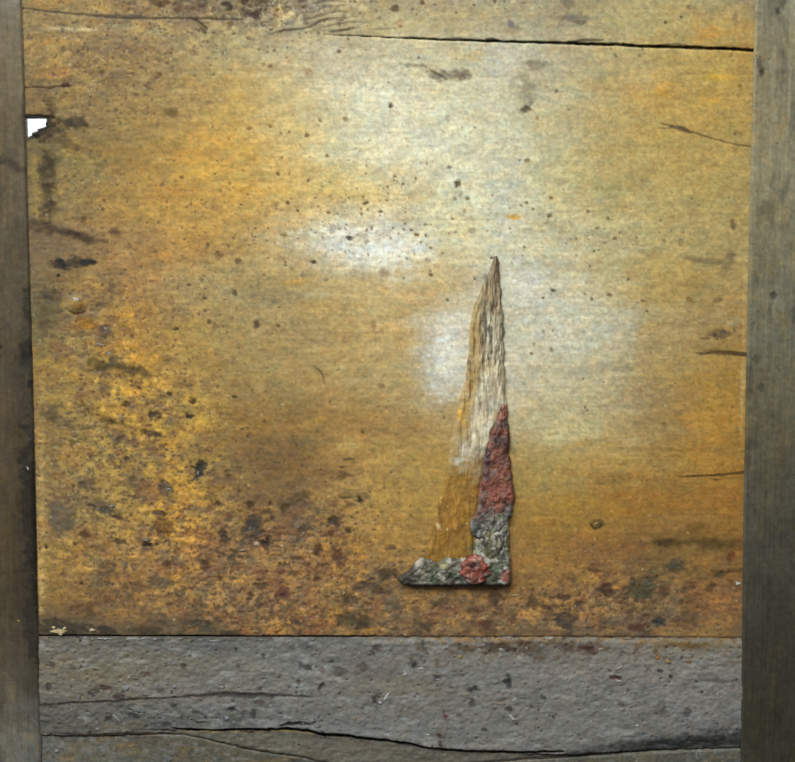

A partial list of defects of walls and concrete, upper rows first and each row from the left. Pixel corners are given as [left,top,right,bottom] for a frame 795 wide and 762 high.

crack [272,1,753,52]
leakage [25,104,88,142]
leakage [38,150,55,213]
leakage [30,223,92,242]
leakage [56,256,96,276]
corrosion [188,460,206,484]
corrosion [218,501,274,558]
corrosion [328,516,351,536]
corrosion [529,596,575,635]
crack [40,692,311,706]
crack [65,721,631,762]